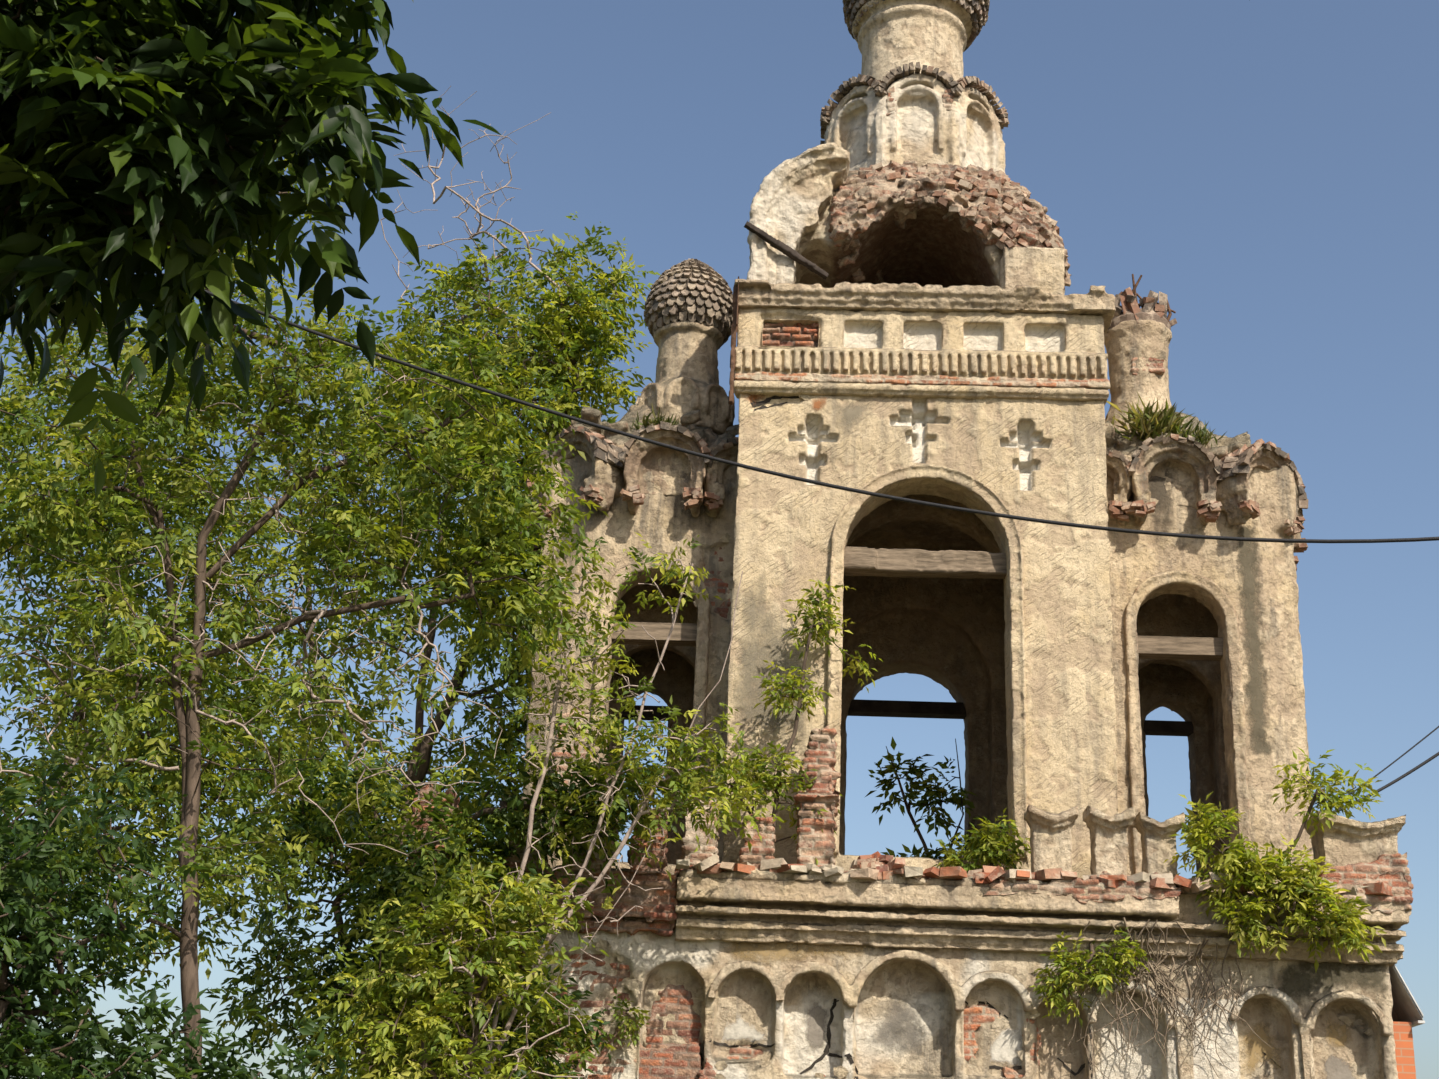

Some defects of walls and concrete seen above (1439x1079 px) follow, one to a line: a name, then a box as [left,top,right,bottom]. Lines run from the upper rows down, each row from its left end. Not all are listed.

flaking render [693,533,733,619]
flaking render [983,879,1185,904]
flaking render [1321,870,1413,914]
flaking render [525,939,773,1079]
crack [700,1034,775,1069]
crack [800,999,858,1079]
flaking render [964,1000,1009,1064]
flaking render [1002,1009,1042,1078]